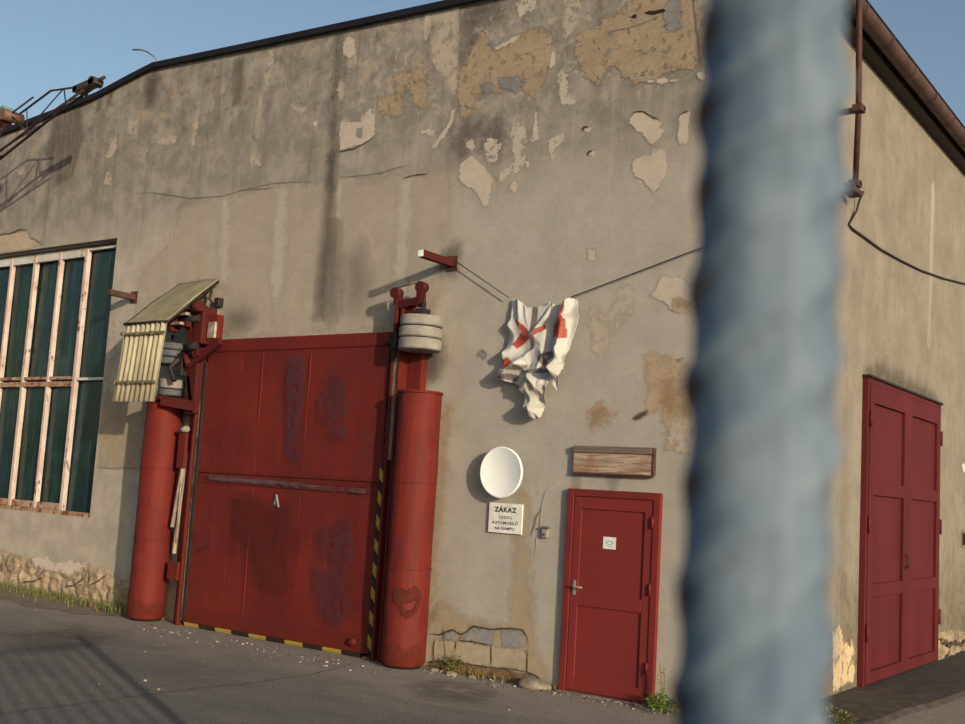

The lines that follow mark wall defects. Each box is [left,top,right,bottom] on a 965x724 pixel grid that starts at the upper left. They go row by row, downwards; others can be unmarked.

flaking render [339,0,705,207]
crack [136,181,316,210]
flaking render [0,229,42,253]
flaking render [649,274,690,313]
flaking render [633,352,690,453]
flaking render [0,548,129,608]
flaking render [432,492,547,680]
flaking render [832,625,855,692]